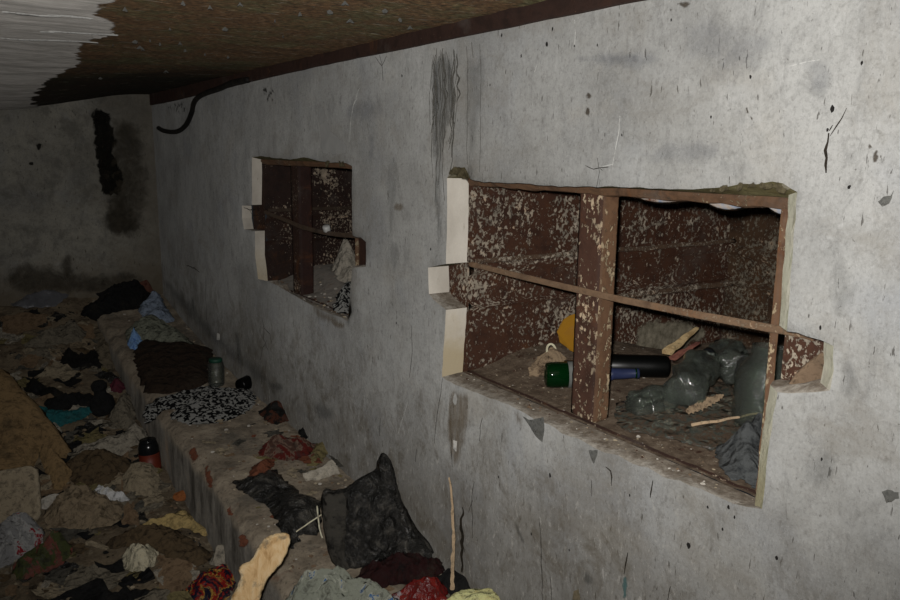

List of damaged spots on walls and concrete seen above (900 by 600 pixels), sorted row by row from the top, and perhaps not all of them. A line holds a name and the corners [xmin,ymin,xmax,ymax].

peeling [91,108,123,196]